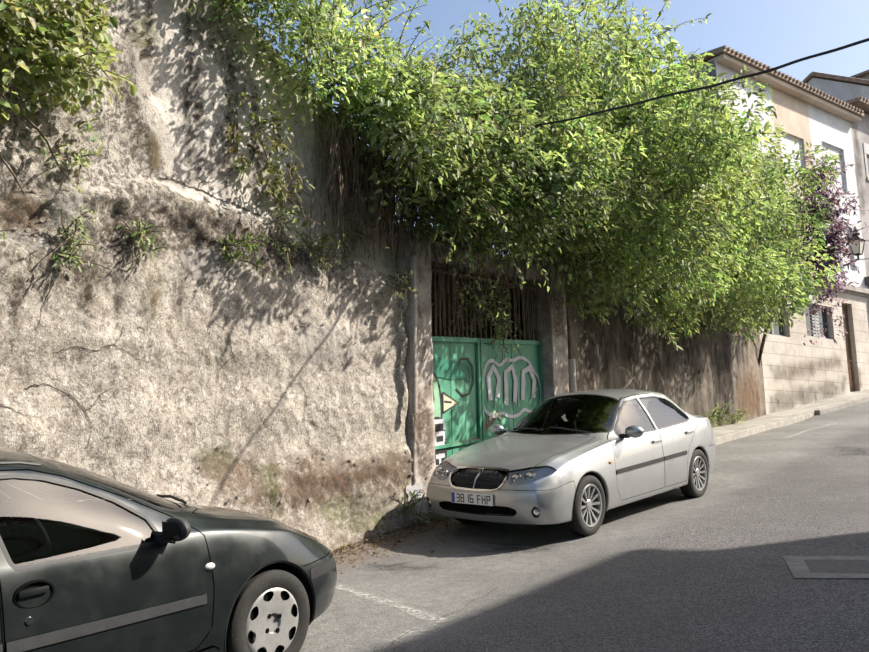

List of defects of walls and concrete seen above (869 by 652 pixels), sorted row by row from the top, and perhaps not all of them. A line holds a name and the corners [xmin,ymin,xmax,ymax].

leakage [182,0,260,175]
crack [158,177,279,227]
leakage [72,256,98,318]
crack [52,323,154,363]
crack [214,322,244,393]
crack [25,383,118,448]